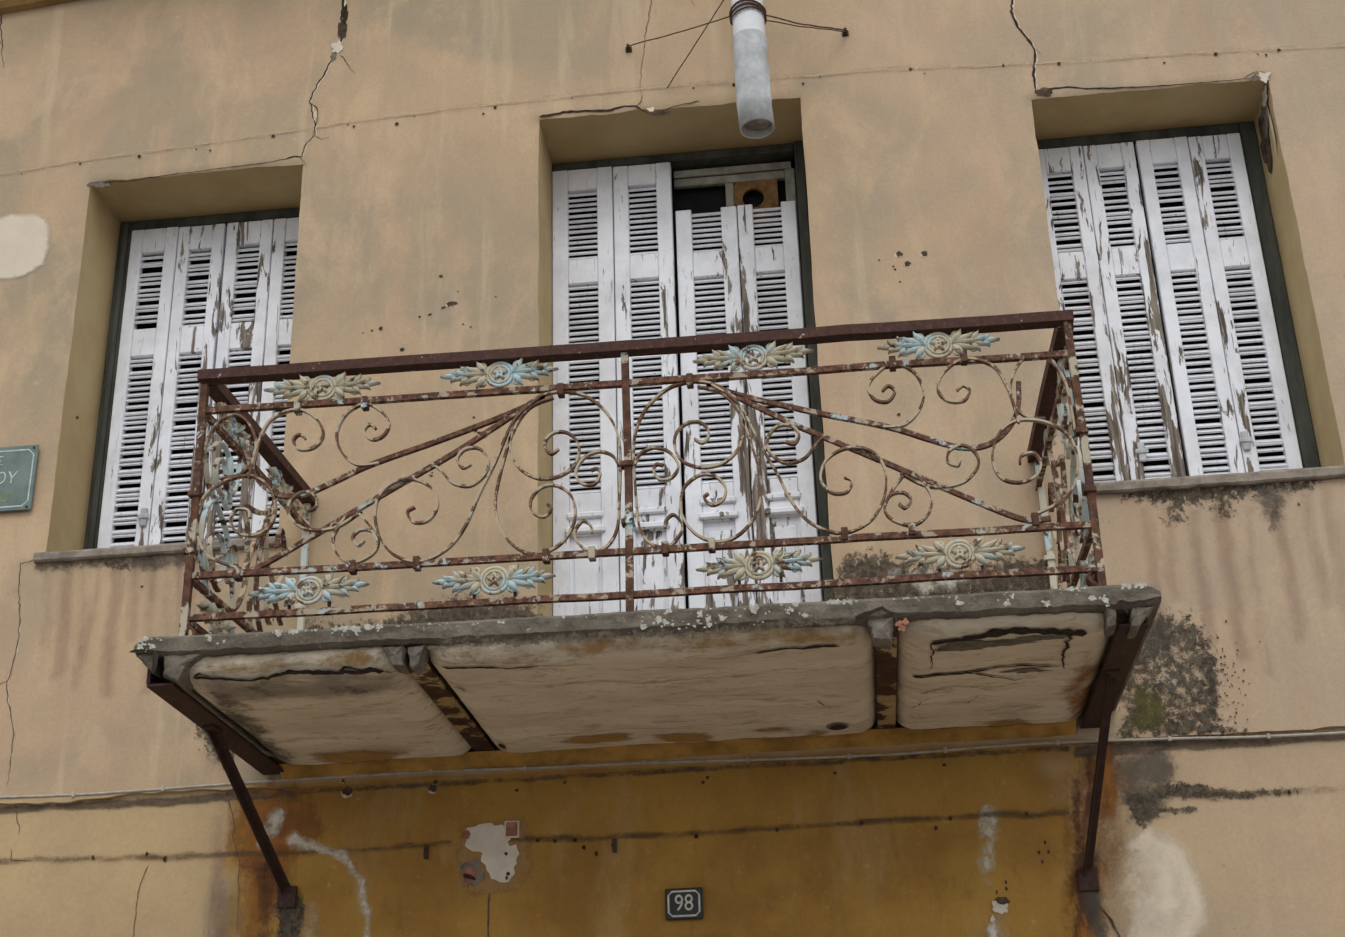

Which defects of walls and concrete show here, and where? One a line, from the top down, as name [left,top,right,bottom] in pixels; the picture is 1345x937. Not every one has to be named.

crack [104,0,355,183]
crack [1010,0,1266,96]
crack [0,559,33,861]
crack [130,649,159,670]
crack [194,640,420,695]
crack [441,645,840,691]
crack [855,606,1087,708]
damp [1082,607,1298,937]
damp [130,834,370,937]
rust [229,779,317,937]
spalling [459,820,531,894]
rust [1067,744,1119,937]